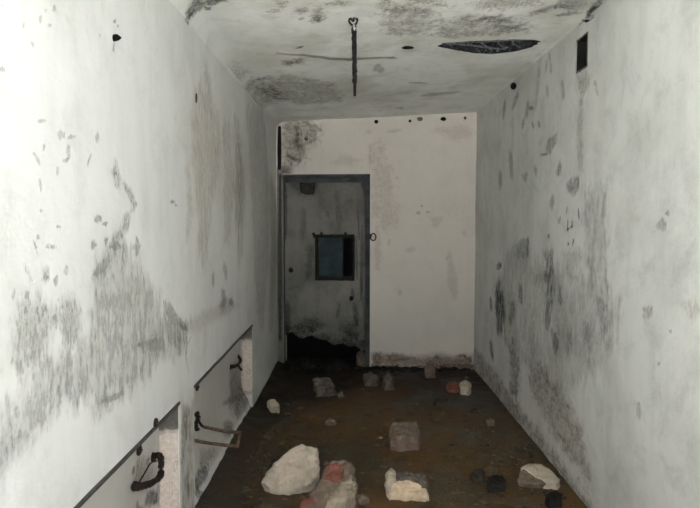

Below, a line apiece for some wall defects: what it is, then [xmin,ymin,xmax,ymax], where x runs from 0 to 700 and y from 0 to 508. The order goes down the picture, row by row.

spalling [427,36,551,57]
leakage [277,120,318,363]
leakage [490,280,504,334]